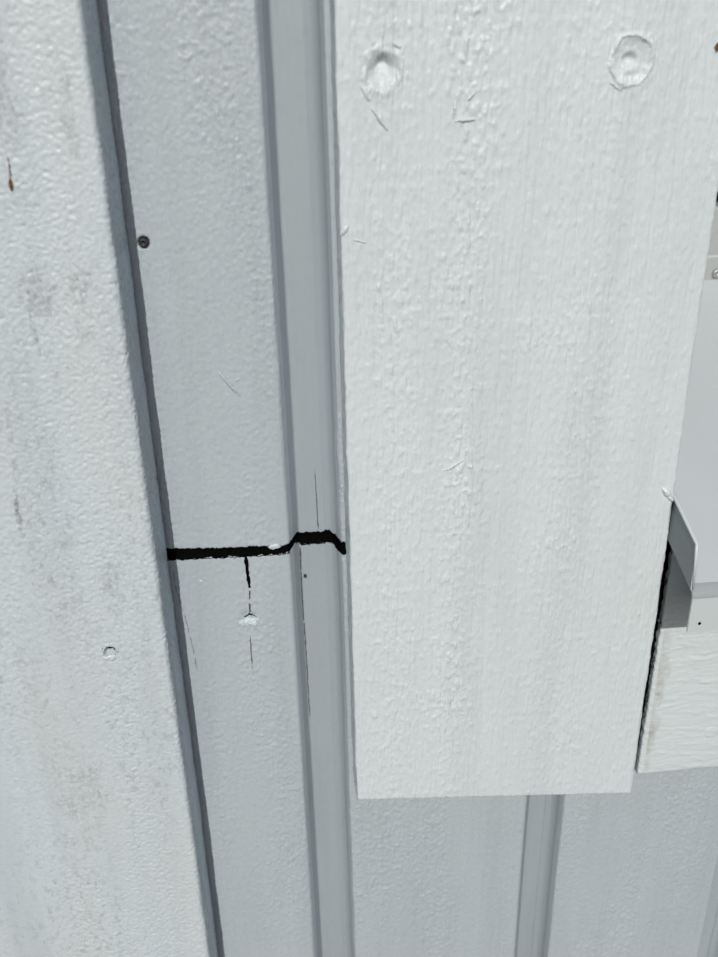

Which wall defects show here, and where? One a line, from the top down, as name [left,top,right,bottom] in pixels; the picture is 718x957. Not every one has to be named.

crack [166,480,346,715]